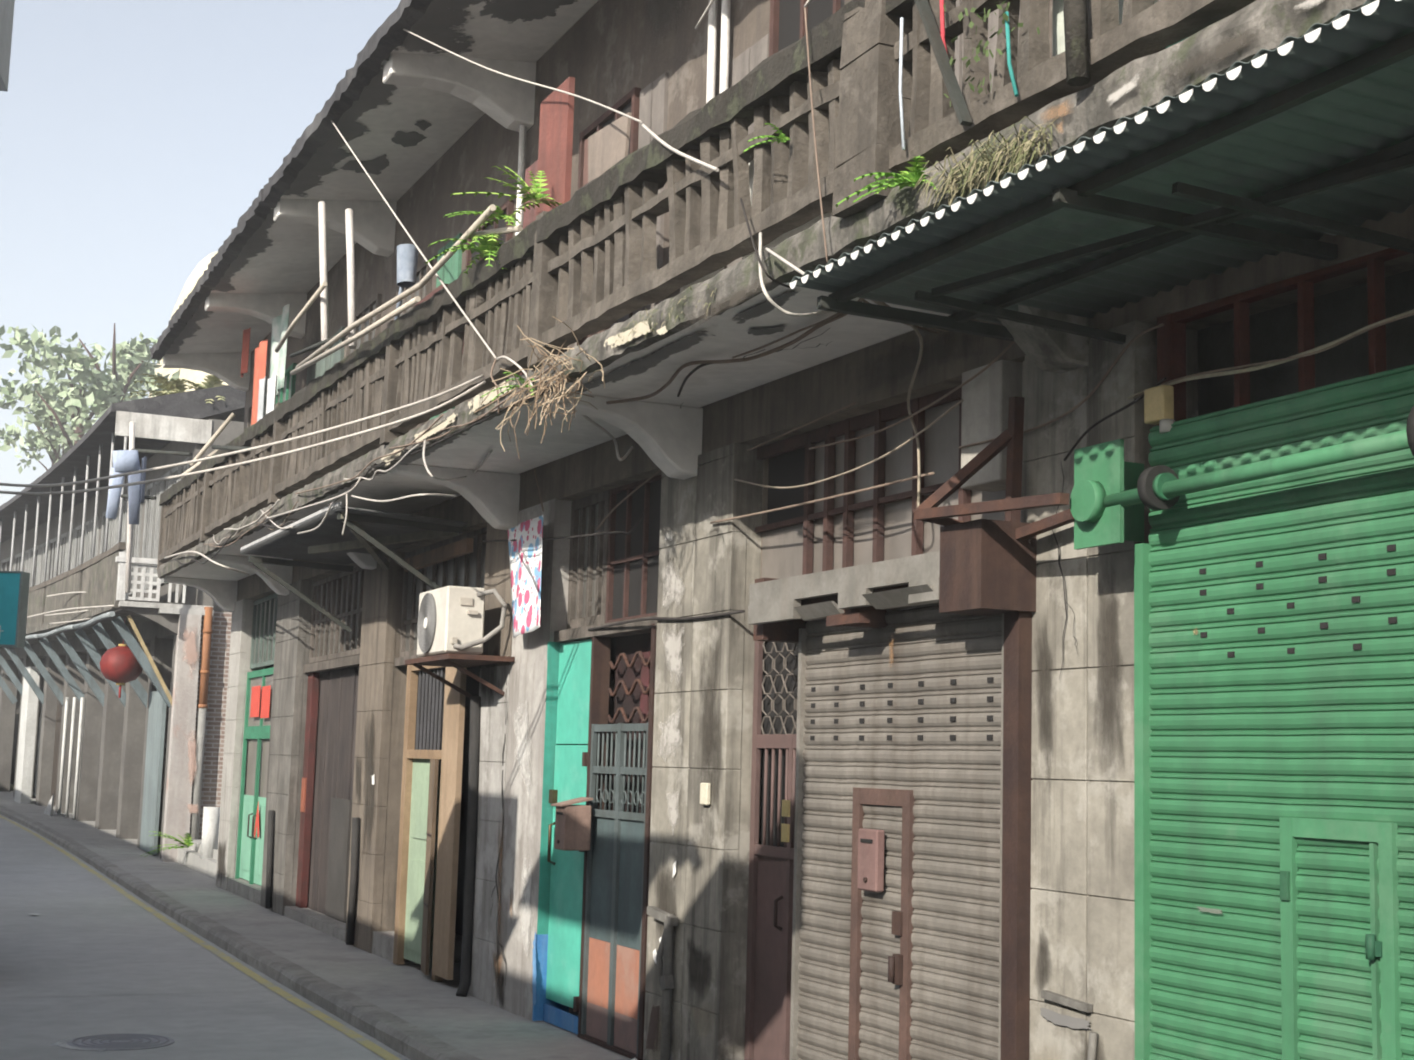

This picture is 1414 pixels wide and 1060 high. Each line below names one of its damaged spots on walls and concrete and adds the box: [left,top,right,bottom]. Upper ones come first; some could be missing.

peeling [479,0,578,23]
peeling [339,120,432,175]
crack [1052,464,1077,680]
damp [700,660,719,793]
damp [1038,634,1050,743]
damp [1098,592,1121,744]
damp [657,861,676,941]
damp [688,943,709,993]
damp [1037,938,1048,988]